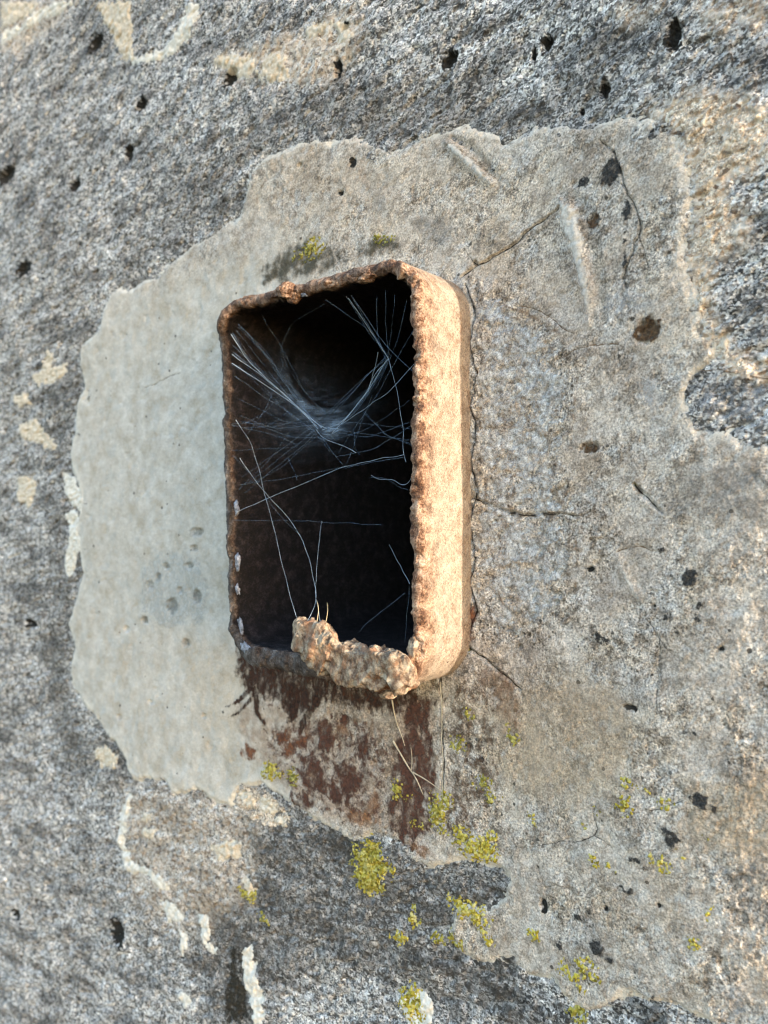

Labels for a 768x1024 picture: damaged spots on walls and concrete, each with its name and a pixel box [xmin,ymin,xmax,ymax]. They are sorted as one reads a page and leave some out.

crack [463,209,602,689]
corrosion [225,654,517,857]